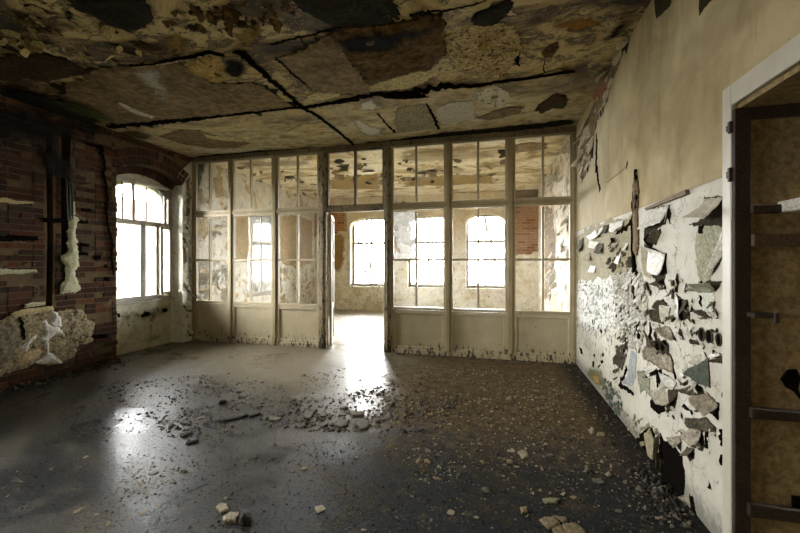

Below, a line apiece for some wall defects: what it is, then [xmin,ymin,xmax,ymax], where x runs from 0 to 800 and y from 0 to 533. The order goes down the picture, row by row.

peeling [187,56,229,83]
crack [86,27,575,275]
peeling [369,0,569,120]
spalling [515,38,722,515]